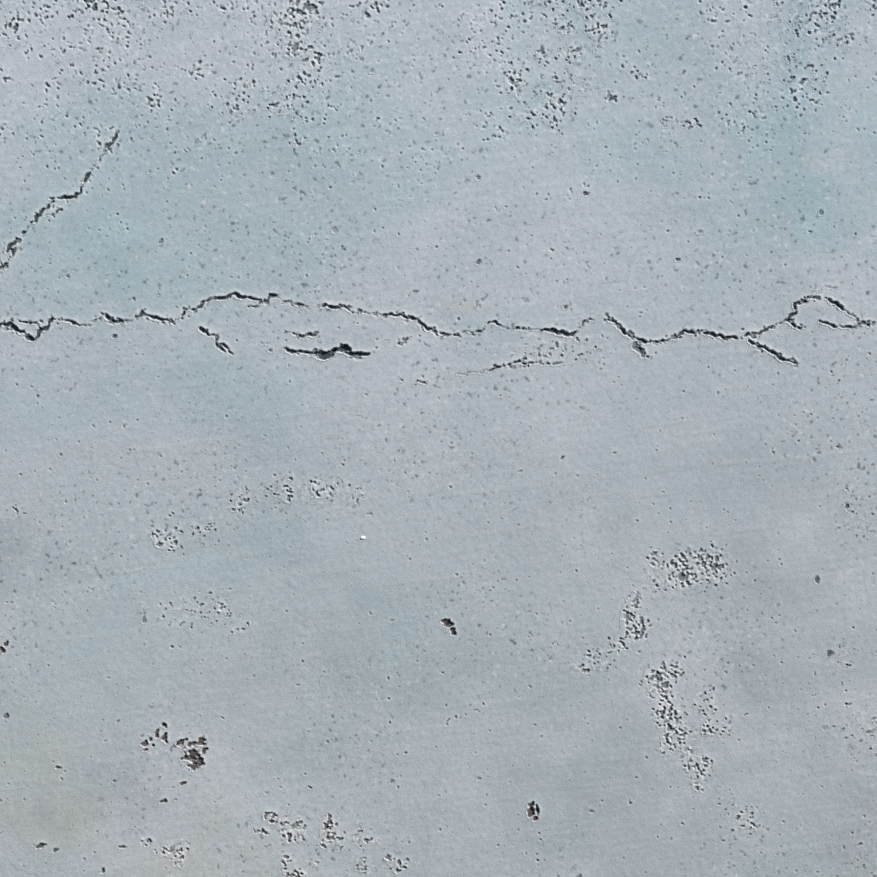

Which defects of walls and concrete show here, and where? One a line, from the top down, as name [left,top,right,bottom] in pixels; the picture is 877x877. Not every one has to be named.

crack [0,129,120,271]
crack [0,285,872,365]
crack [398,376,427,387]
crack [456,359,564,377]